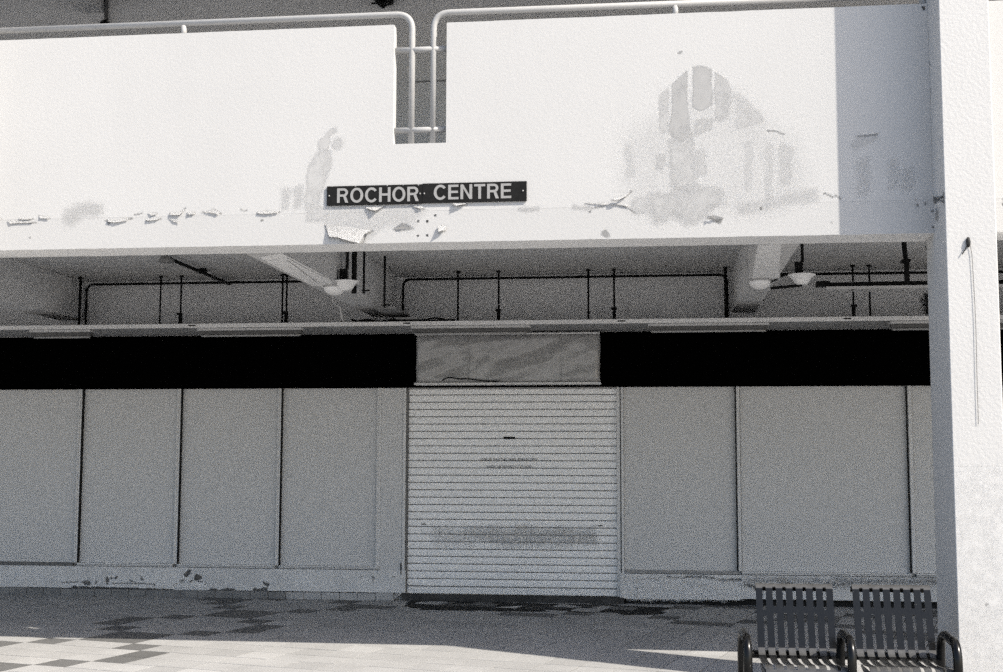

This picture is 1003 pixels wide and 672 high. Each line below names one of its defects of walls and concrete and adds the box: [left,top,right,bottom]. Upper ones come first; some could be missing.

peeling [0,200,221,227]
peeling [322,204,428,244]
peeling [62,569,235,591]